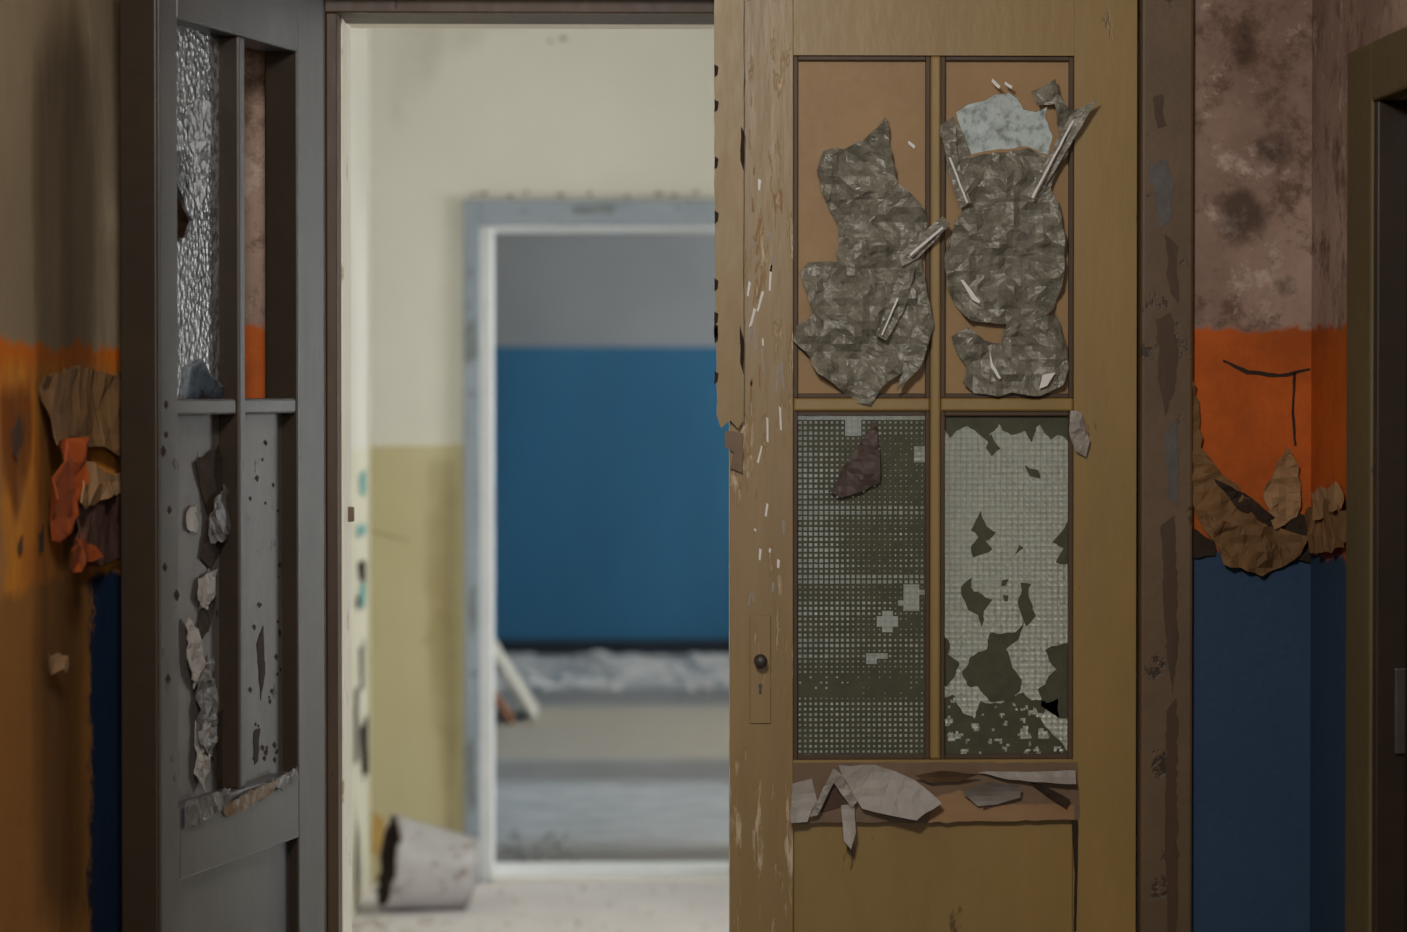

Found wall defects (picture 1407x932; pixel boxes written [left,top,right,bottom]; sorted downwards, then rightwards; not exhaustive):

crack [1223,360,1310,446]
peeling [18,365,121,573]
peeling [48,652,69,675]